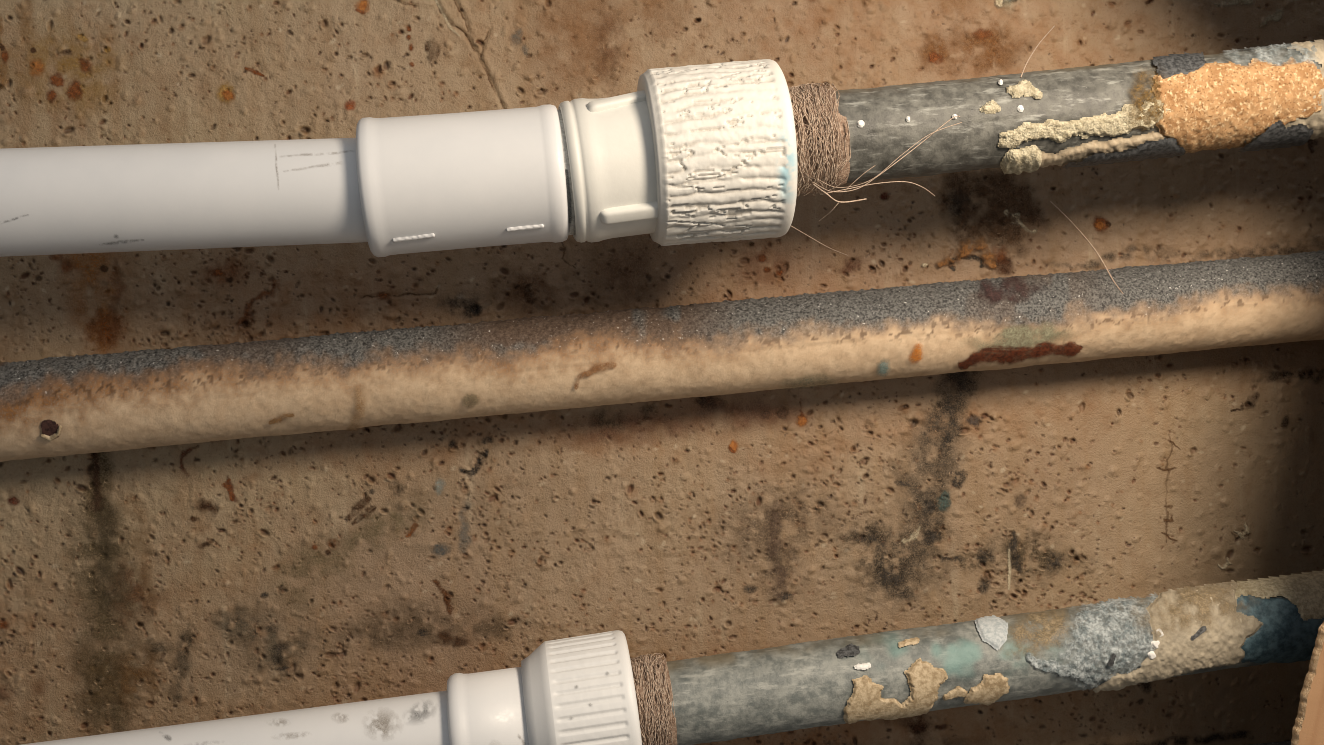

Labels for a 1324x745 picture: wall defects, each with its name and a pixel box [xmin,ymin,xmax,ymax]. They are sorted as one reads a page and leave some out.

corrosion [31,35,102,101]
crack [412,0,502,104]
water stain [846,371,1061,598]
water stain [77,452,194,731]
water stain [739,494,824,600]